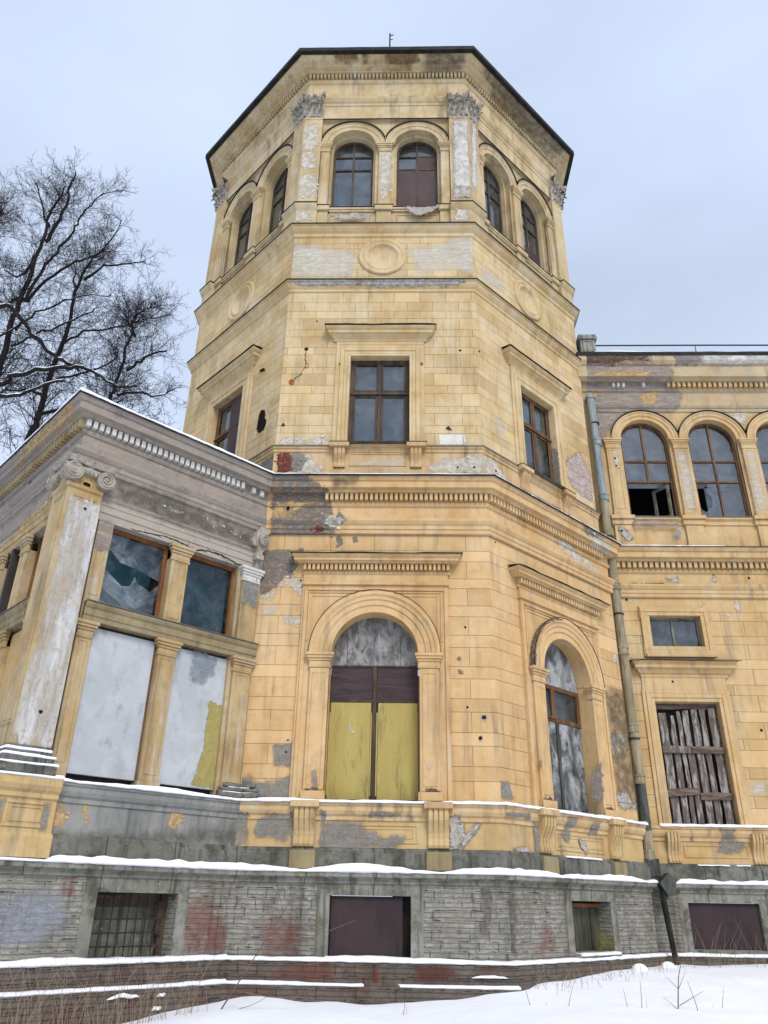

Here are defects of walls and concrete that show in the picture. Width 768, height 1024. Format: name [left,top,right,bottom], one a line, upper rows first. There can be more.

peeling [451,119,478,221]
peeling [0,495,53,563]
flaking render [241,423,359,627]
peeling [429,426,506,479]
peeling [566,451,593,502]
peeling [13,481,114,747]
water stain [606,693,636,802]
peeling [616,791,637,811]